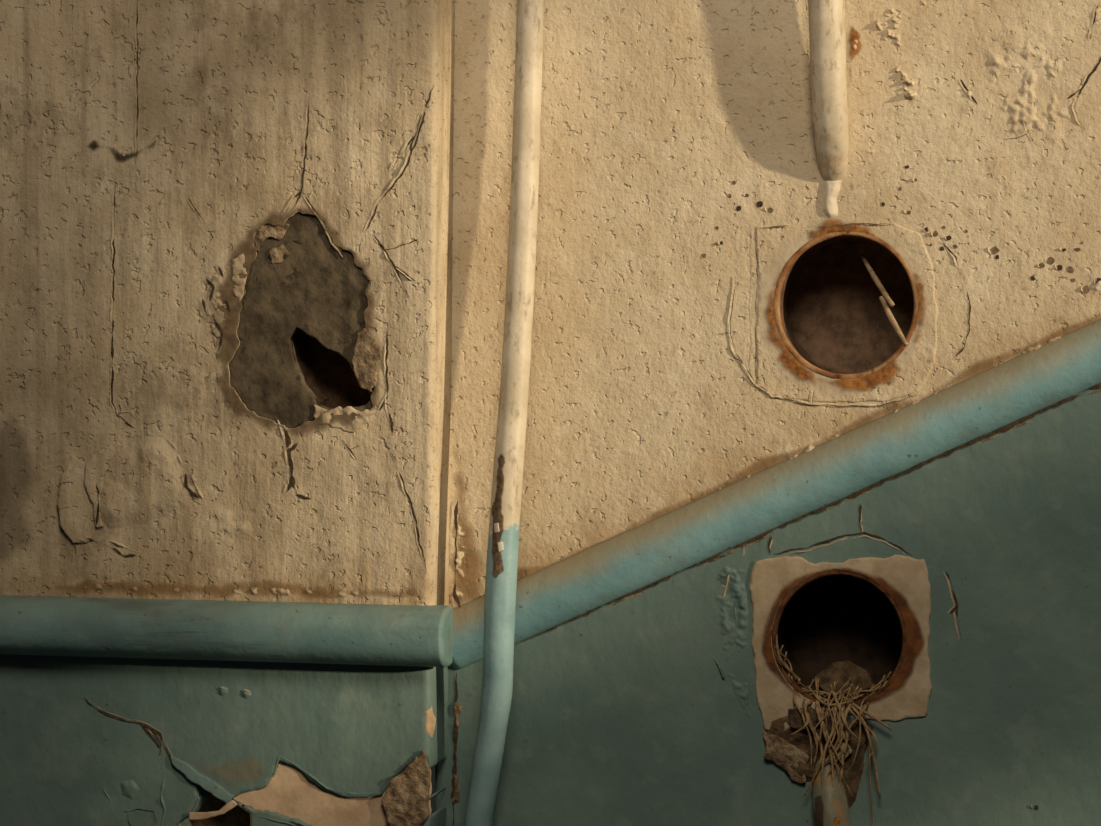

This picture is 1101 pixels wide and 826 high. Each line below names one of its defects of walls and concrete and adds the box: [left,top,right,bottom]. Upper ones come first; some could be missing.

crack [280,84,434,298]
rust [811,220,873,238]
flaking render [202,210,382,433]
rust [767,277,814,381]
rust [835,360,897,391]
rust [763,568,923,703]
peeling [425,705,436,738]
peeling [170,750,432,826]